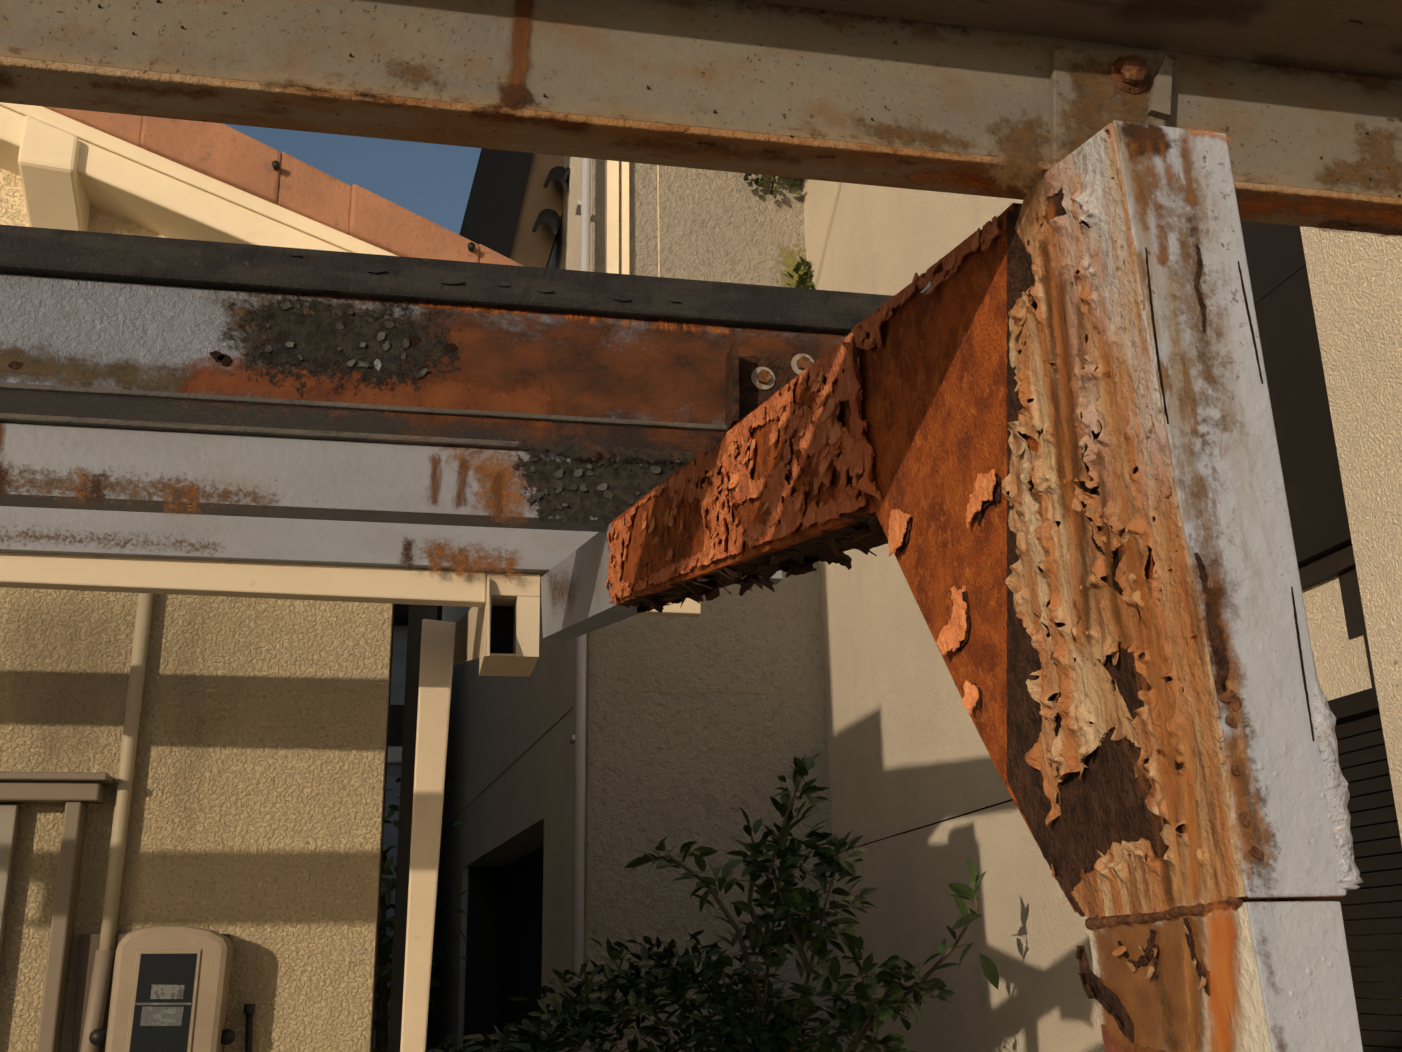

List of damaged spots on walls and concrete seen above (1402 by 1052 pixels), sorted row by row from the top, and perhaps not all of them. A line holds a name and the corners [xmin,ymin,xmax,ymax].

corrosion [264,82,390,103]
corrosion [472,0,588,133]
corrosion [857,117,968,150]
peeling [1044,190,1067,226]
corrosion [987,50,1227,456]
corrosion [1237,123,1402,236]
corrosion [0,292,845,521]
corrosion [1040,206,1089,650]
peeling [512,205,1180,917]
corrosion [1093,451,1237,1052]
corrosion [1192,474,1276,891]